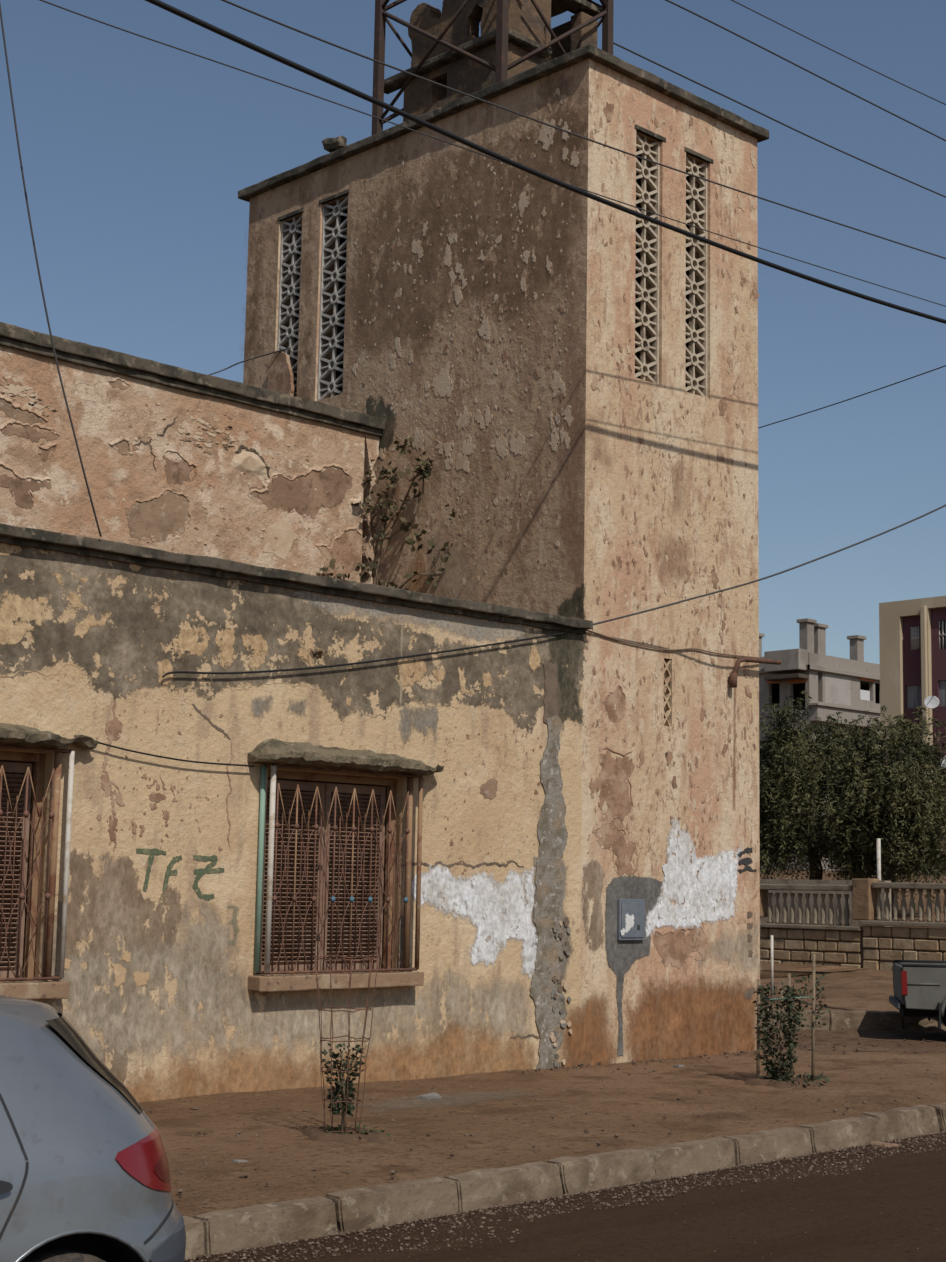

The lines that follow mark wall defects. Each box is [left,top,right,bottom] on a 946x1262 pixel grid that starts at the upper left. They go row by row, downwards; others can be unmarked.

peeling [594,81,734,199]
peeling [591,338,693,459]
spalling [0,462,52,509]
spalling [108,401,267,562]
spalling [244,444,363,580]
water stain [422,531,477,598]
peeling [695,446,753,505]
water stain [0,542,589,742]
spalling [587,468,756,877]
water stain [560,910,572,984]